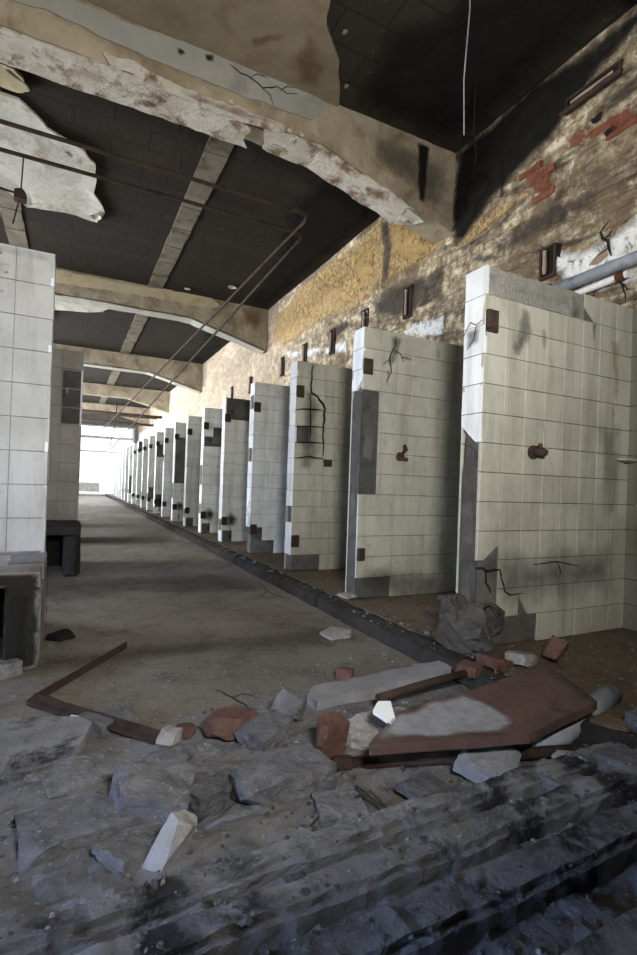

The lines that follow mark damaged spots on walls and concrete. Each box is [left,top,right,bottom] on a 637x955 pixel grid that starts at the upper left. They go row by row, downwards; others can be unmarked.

crack [230,65,295,106]
spalling [568,104,637,150]
peeling [0,0,442,354]
spalling [463,160,555,244]
crack [383,341,404,382]
crack [295,365,326,459]
spalling [346,390,379,593]